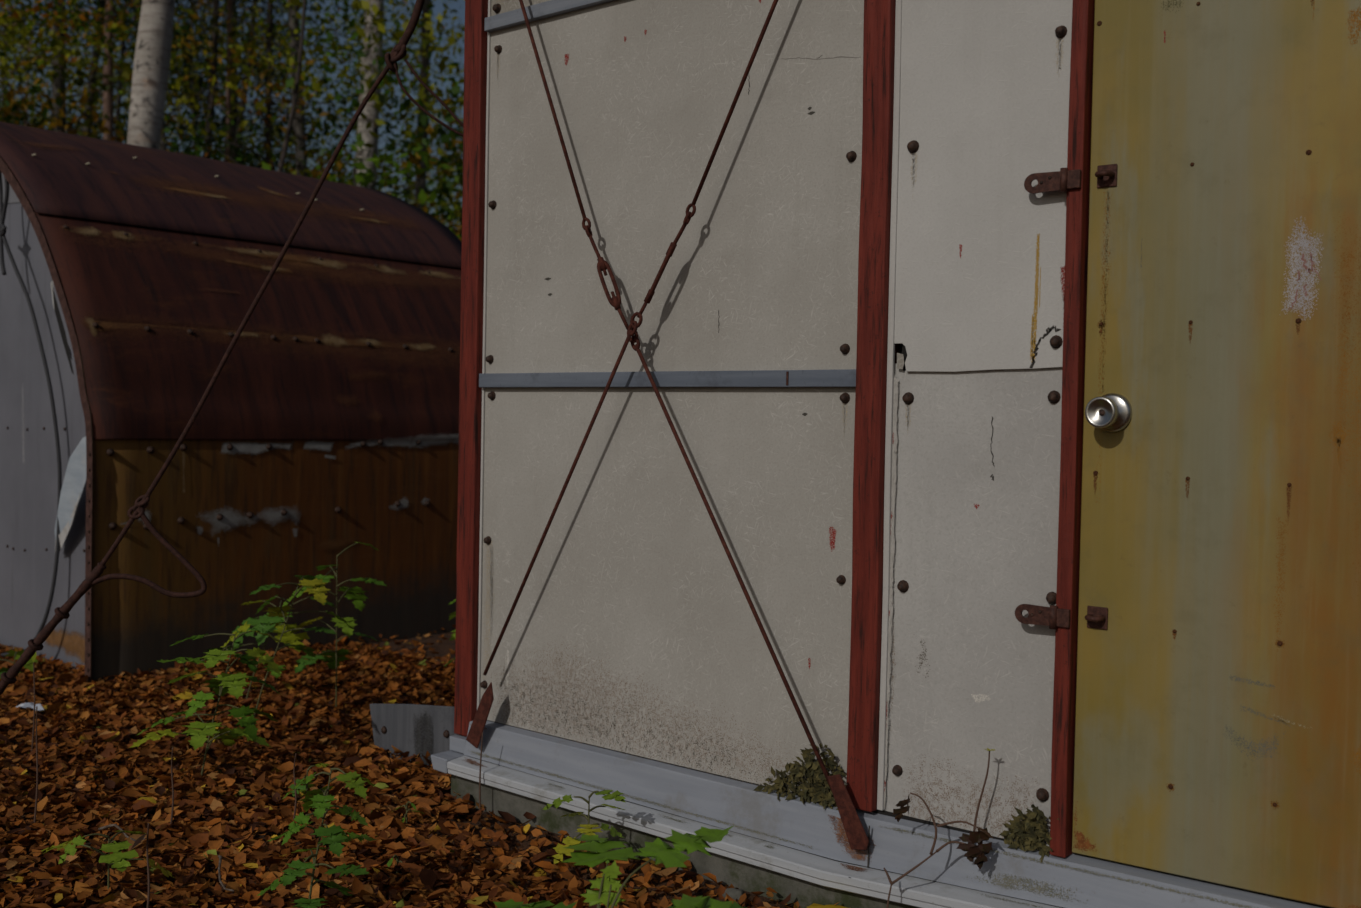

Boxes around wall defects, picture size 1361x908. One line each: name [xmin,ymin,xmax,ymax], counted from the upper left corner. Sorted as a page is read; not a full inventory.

rust [60,224,403,274]
rust [1030,234,1041,362]
peeling [1282,218,1324,320]
peeling [195,503,301,547]
water stain [482,543,809,794]